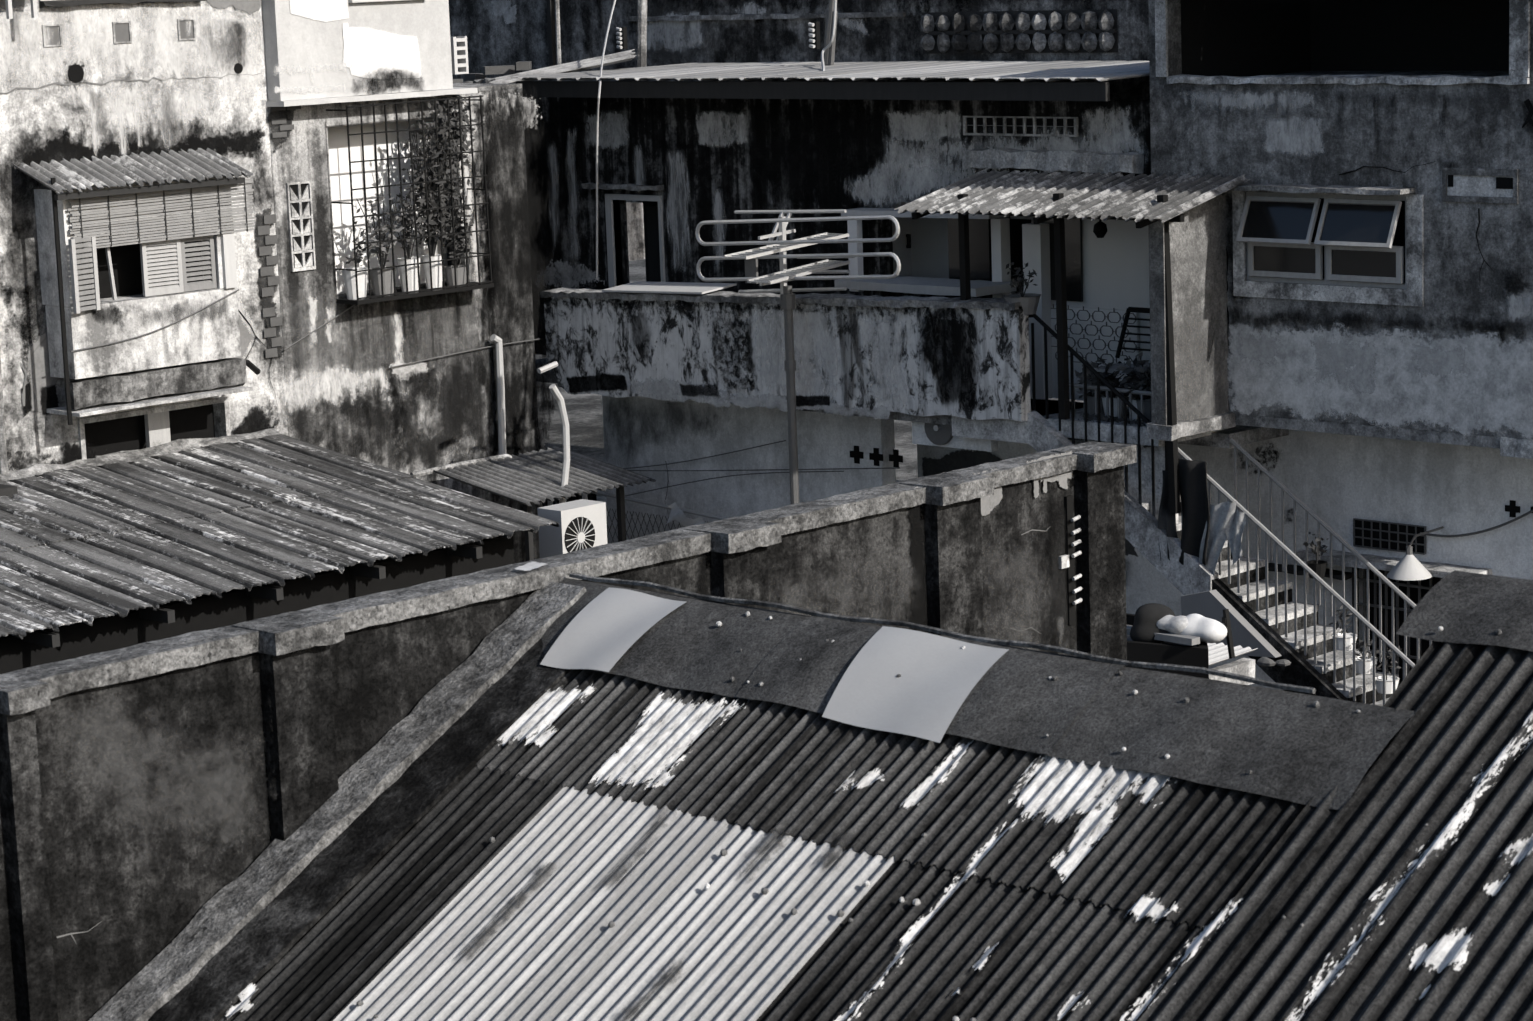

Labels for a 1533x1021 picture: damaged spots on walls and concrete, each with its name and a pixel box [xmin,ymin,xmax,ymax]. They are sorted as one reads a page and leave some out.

leakage [647,0,930,63]
leakage [231,87,976,480]
leakage [6,440,100,471]
peeling [515,562,546,571]
peeling [497,685,594,747]
peeling [583,692,746,789]
peeling [834,755,1178,1021]
peeling [1285,711,1533,1021]
peeling [1120,898,1243,1021]